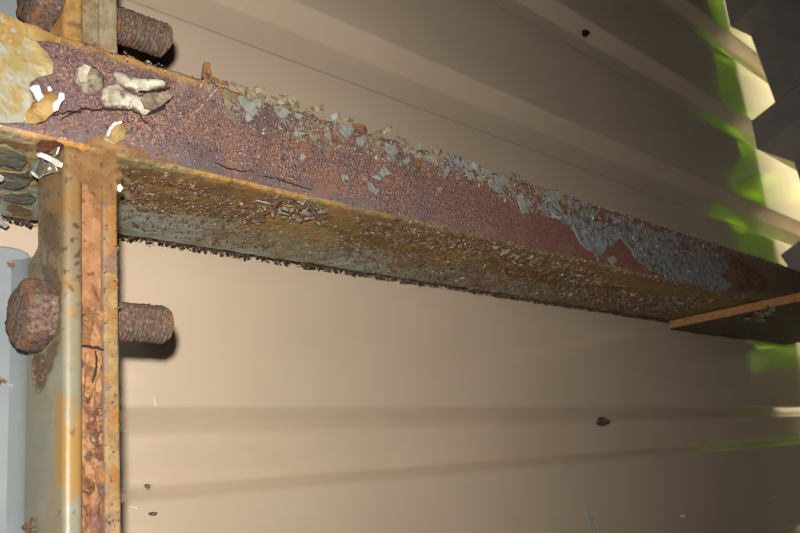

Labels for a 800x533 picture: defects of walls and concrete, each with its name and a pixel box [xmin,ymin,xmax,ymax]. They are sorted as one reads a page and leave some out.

peeling [0,12,65,124]
rust [0,139,38,151]
peeling [0,139,64,204]
peeling [104,121,126,144]
rust [125,166,298,211]
peeling [201,62,732,292]
rust [7,203,60,256]
rust [327,217,446,253]
rust [32,265,61,391]